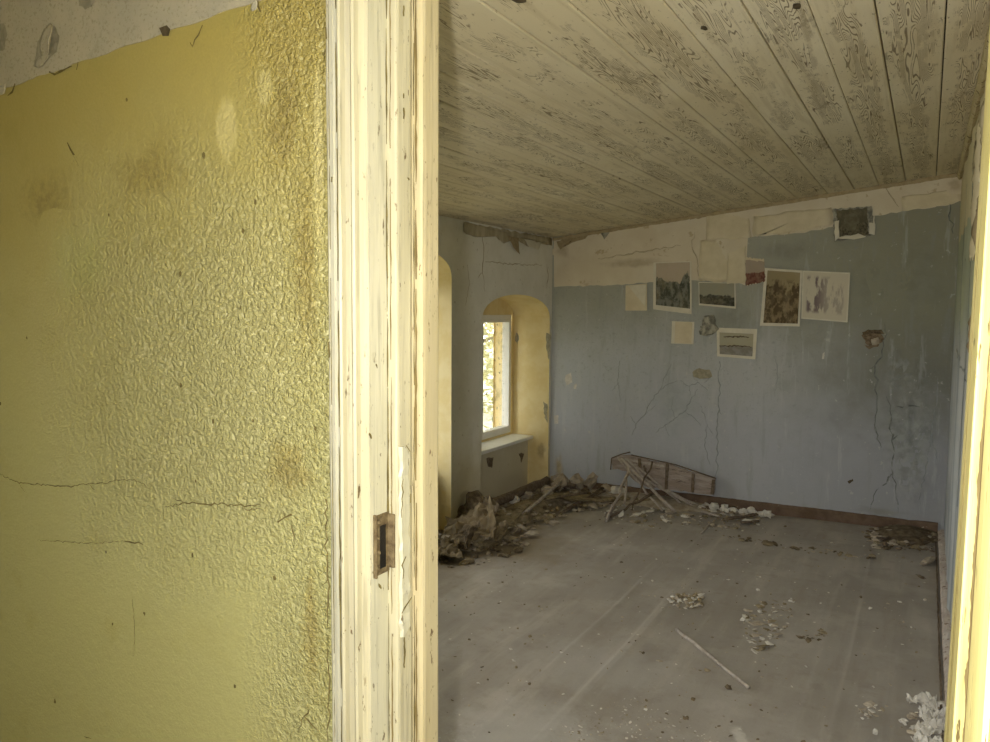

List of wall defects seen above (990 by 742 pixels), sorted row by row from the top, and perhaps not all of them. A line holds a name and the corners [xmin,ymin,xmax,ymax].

flaking render [34,23,59,68]
flaking render [861,330,884,349]
crack [612,361,722,484]
crack [870,326,919,513]
crack [1,474,295,541]
crack [40,538,143,546]